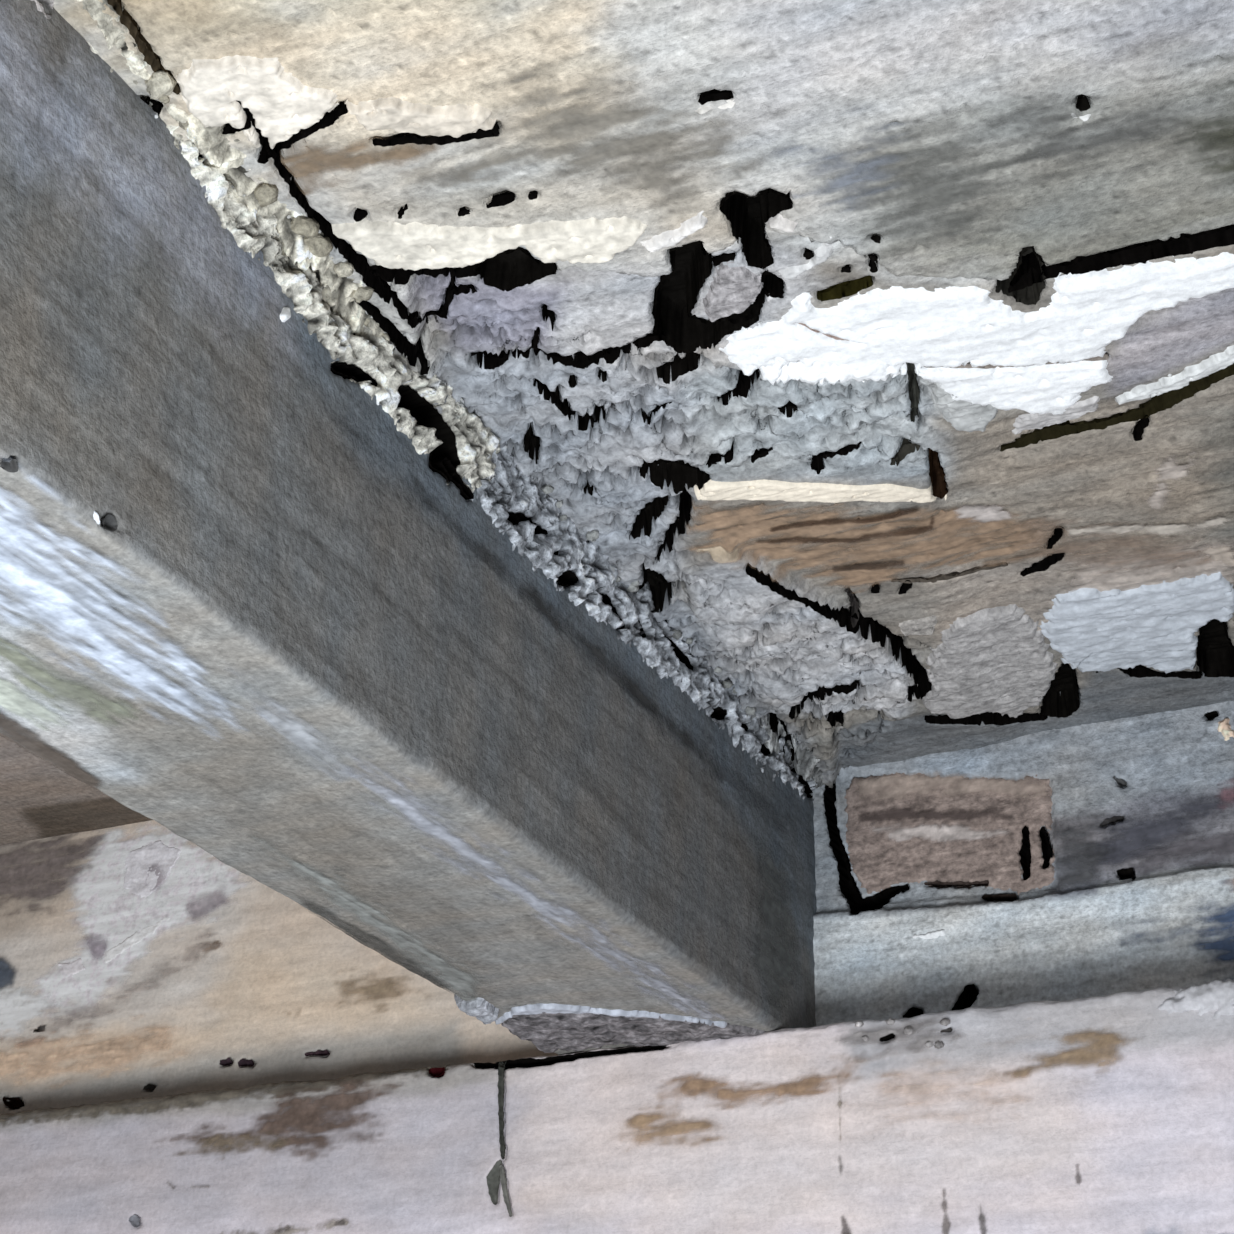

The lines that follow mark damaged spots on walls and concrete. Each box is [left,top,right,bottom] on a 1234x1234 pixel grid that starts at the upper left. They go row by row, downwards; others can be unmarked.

flaking render [176,55,499,195]
hole [695,89,736,114]
peeling [279,307,291,322]
peeling [331,188,1234,435]
peeling [93,511,118,532]
spalling [928,448,948,499]
spalling [466,423,824,802]
peeling [899,544,1234,719]
spalling [844,772,1124,902]
spalling [1116,868,1134,880]
crack [473,1046,666,1217]